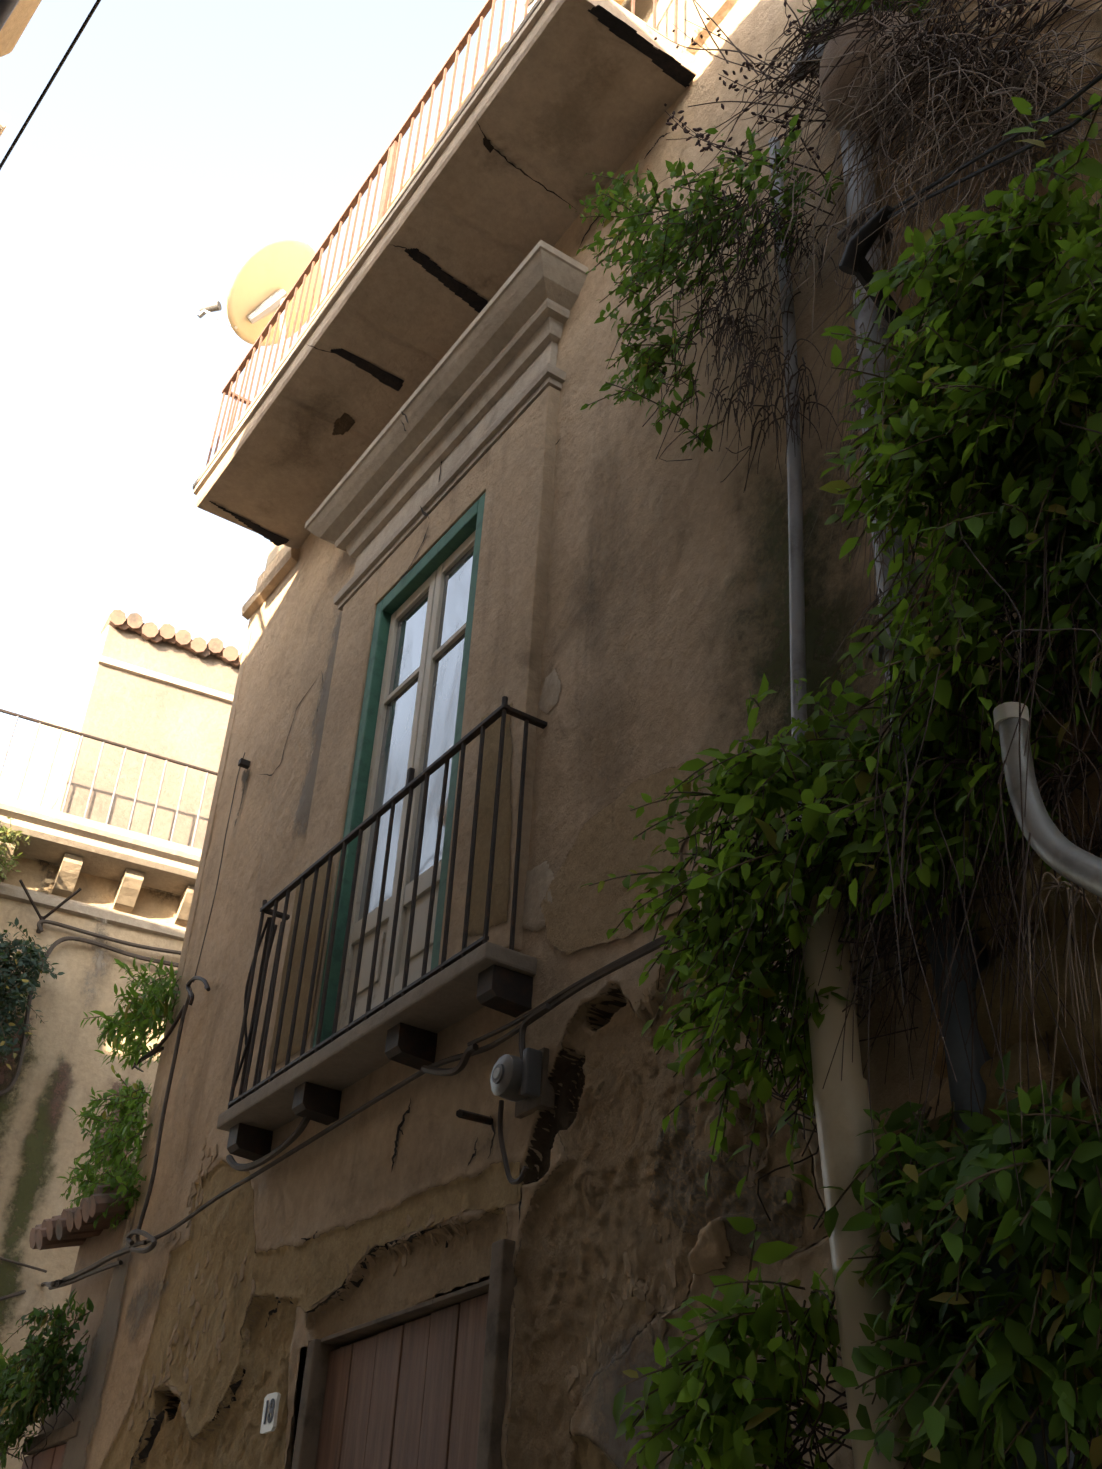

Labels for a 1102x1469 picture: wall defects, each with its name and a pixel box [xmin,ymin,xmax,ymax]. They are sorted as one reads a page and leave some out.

crack [478,124,605,244]
crack [391,1098,411,1173]
flaking render [100,946,828,1469]